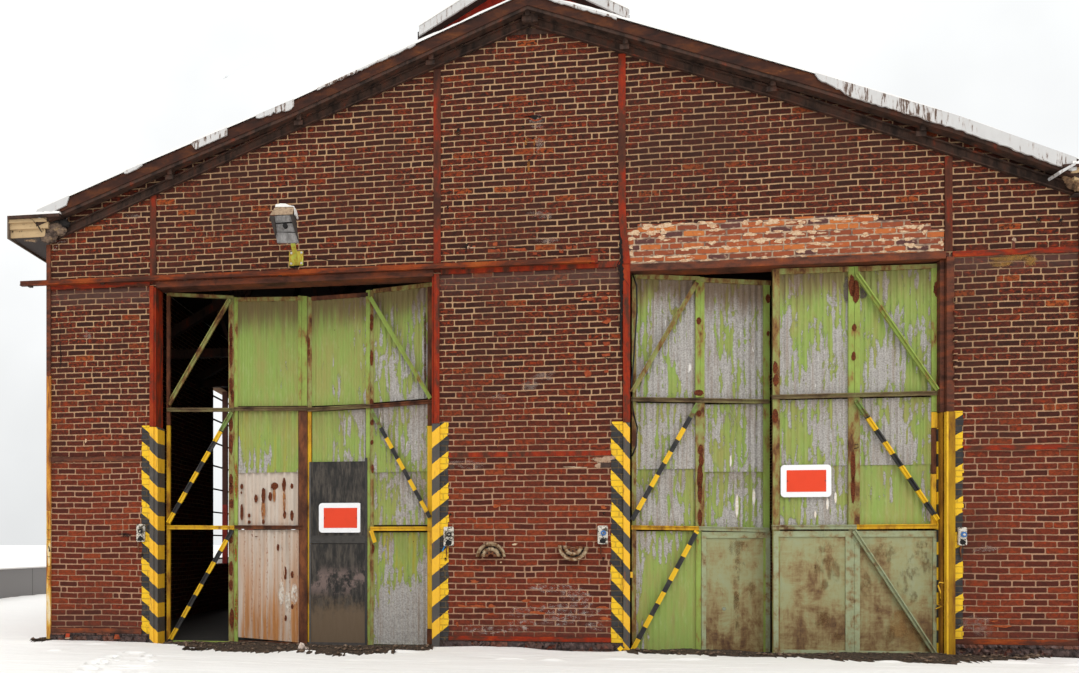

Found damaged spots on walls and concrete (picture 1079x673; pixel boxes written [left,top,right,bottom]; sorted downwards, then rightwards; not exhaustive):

peeling [628,215,945,263]
corrosion [848,274,860,303]